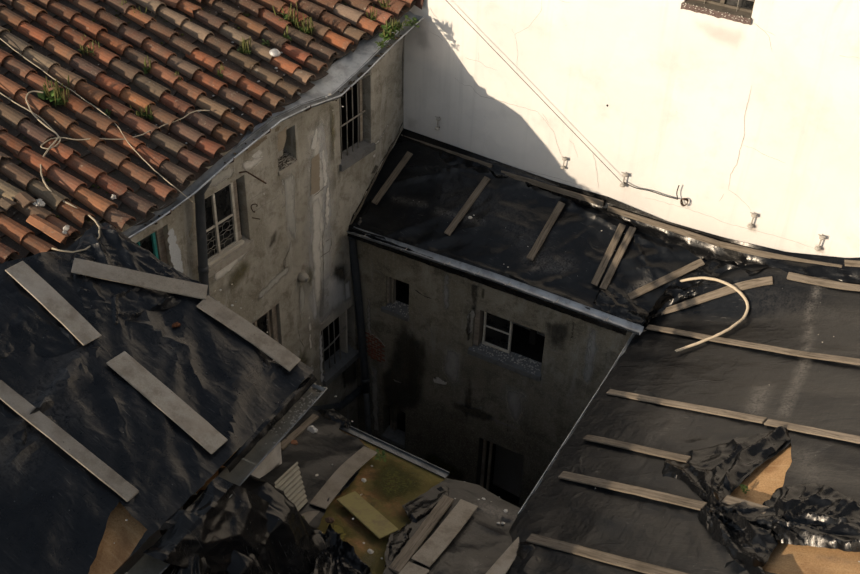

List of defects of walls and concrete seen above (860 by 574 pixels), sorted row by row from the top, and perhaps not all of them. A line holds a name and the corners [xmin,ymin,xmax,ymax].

peeling [168,228,184,273]
peeling [310,128,330,316]
crack [647,85,809,247]
leakage [372,328,426,431]